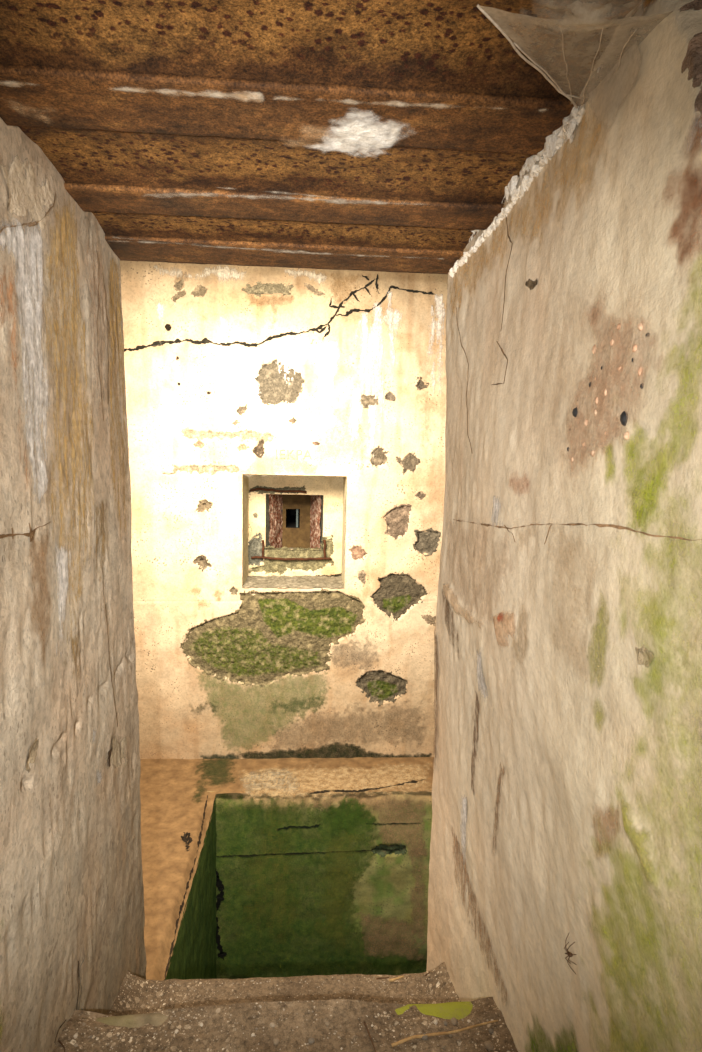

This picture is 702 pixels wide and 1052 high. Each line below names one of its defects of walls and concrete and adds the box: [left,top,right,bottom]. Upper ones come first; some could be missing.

crack [97,254,434,421]
spalling [255,359,305,406]
leakage [348,292,402,447]
leakage [428,294,445,388]
crack [456,215,513,452]
crack [0,521,51,542]
spalling [248,533,342,577]
spalling [384,491,441,556]
crack [453,519,702,544]
spalling [180,545,436,687]
spalling [355,670,408,706]